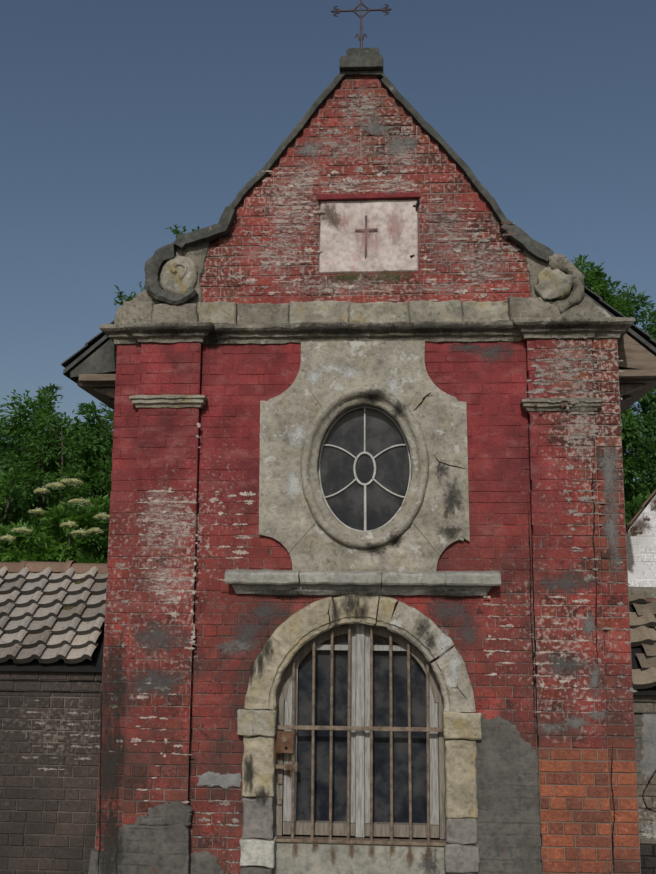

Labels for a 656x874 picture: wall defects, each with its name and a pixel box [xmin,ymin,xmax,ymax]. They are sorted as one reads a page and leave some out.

peeling [230,120,443,295]
peeling [322,274,398,301]
peeling [525,336,623,450]
peeling [137,486,256,581]
peeling [118,556,197,650]
peeling [533,464,630,714]
peeling [109,716,193,766]
peeling [196,800,239,874]
leakage [244,757,268,804]
crack [642,770,656,816]